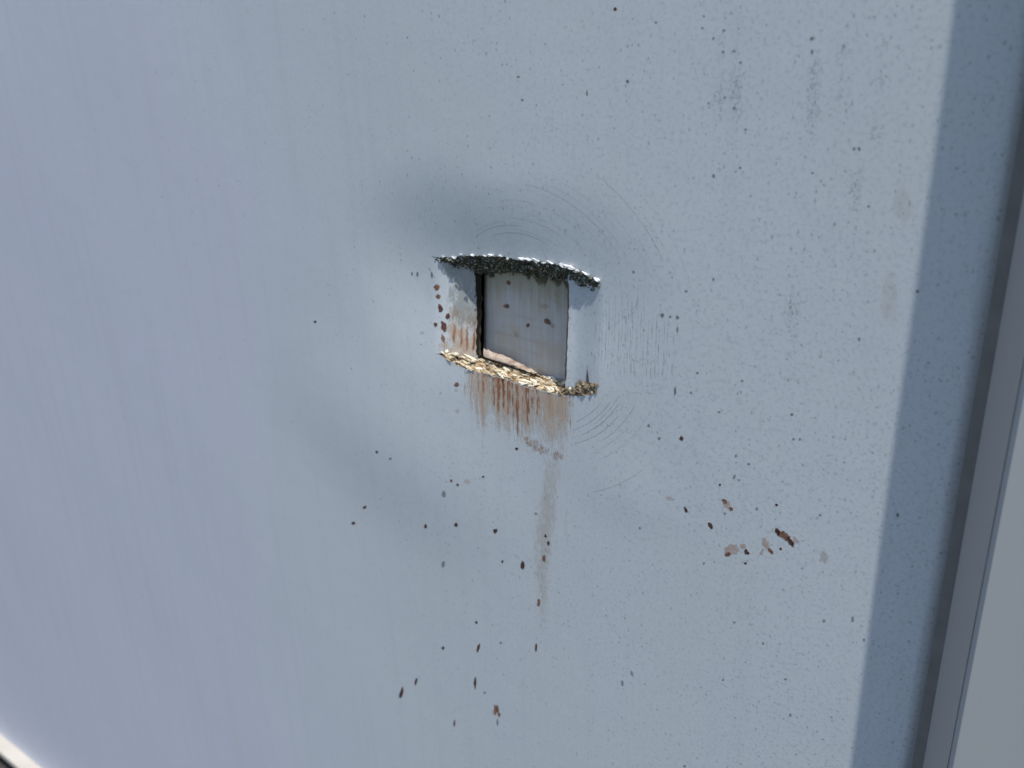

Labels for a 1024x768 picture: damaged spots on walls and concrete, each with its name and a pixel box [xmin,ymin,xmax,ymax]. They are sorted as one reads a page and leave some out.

corrosion [434,284,476,357]
spalling [411,254,601,396]
corrosion [454,372,571,455]